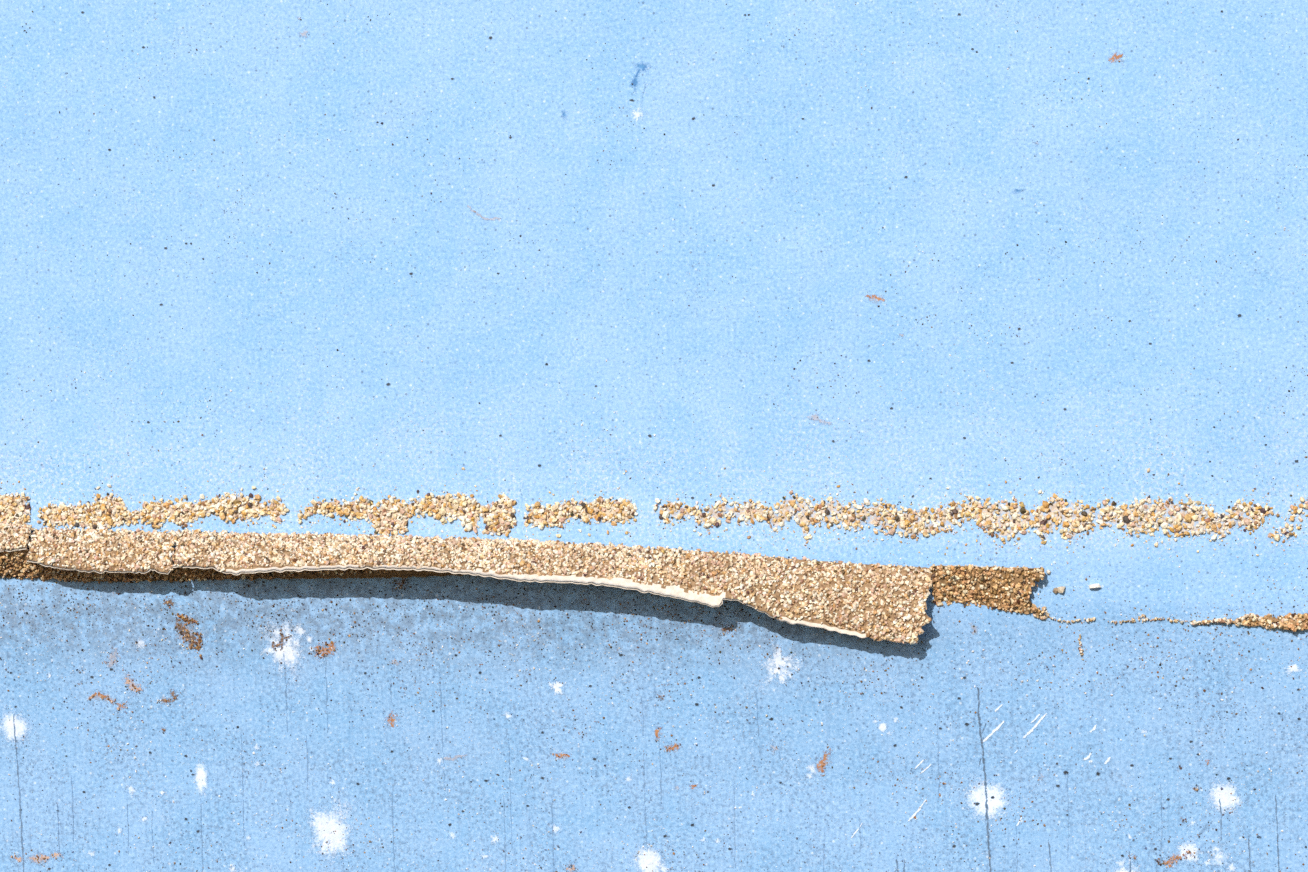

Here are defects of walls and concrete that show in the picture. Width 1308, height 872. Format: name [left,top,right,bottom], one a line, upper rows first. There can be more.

damp [0,705,37,746]
damp [301,778,360,869]
damp [958,769,1021,825]
damp [1174,776,1249,872]
damp [628,839,670,872]